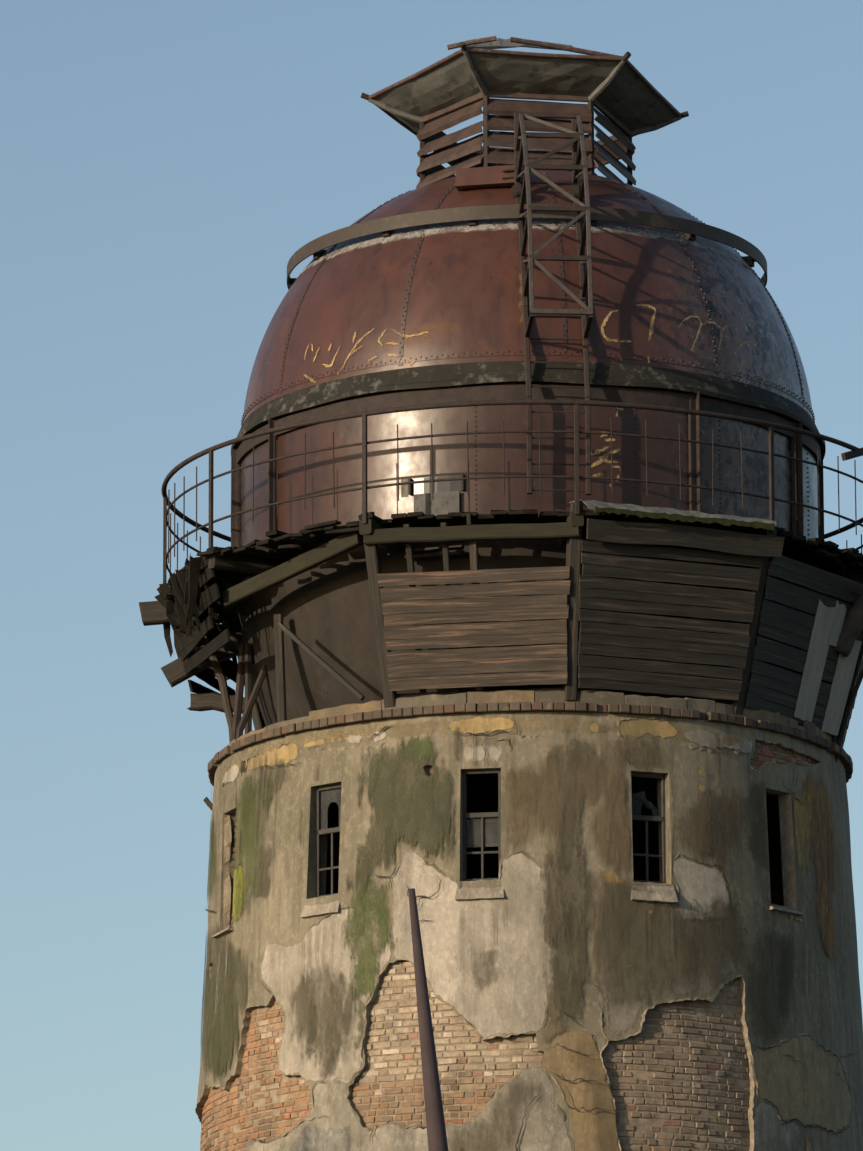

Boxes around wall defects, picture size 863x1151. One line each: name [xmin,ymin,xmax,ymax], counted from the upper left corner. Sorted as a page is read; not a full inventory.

flaking render [195,849,575,1151]
flaking render [599,975,852,1151]